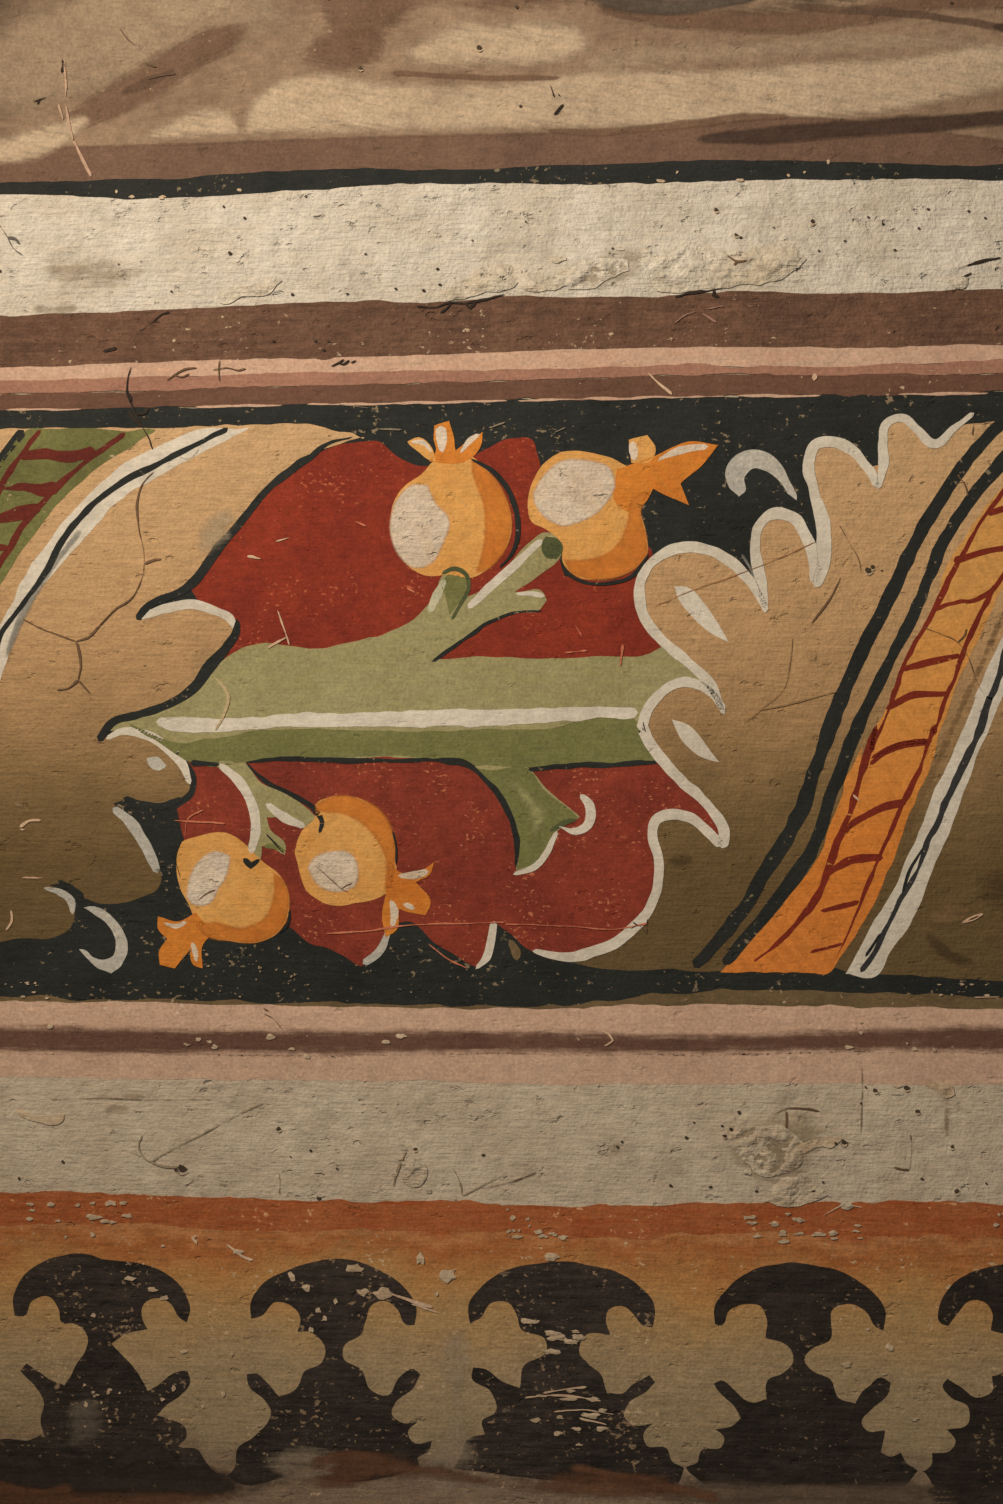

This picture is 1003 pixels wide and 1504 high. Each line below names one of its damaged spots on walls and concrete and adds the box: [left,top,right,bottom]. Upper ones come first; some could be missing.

crack [23,311,246,693]
peeling [521,1318,586,1355]
peeling [530,1389,609,1446]